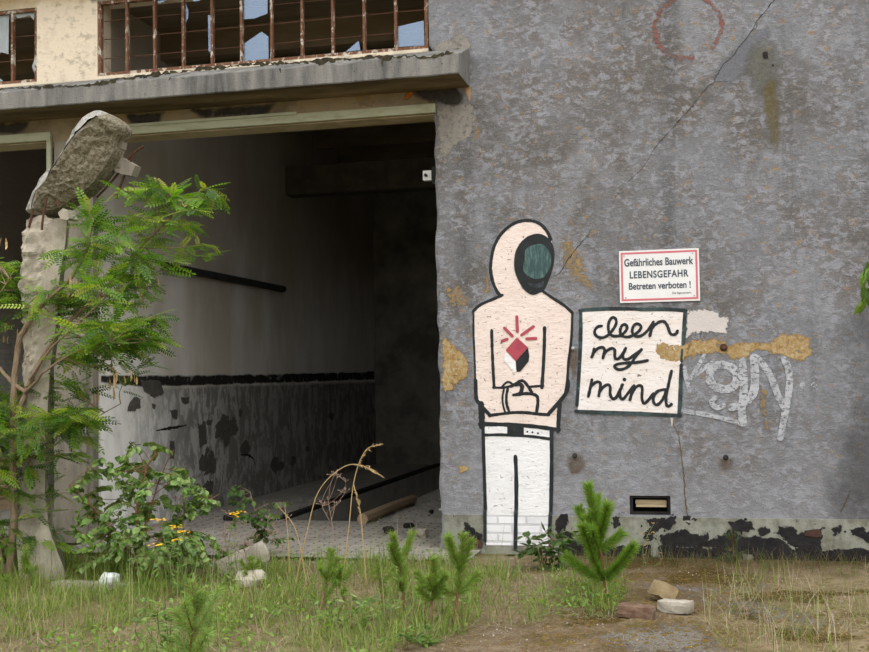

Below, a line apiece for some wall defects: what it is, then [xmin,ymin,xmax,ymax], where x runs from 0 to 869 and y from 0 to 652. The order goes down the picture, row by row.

crack [612,1,774,204]
spalling [28,197,59,230]
peeling [441,338,472,392]
peeling [682,332,814,365]
peeling [128,379,164,412]
peeling [169,396,189,420]
peeling [198,408,251,495]
peeling [633,514,869,562]